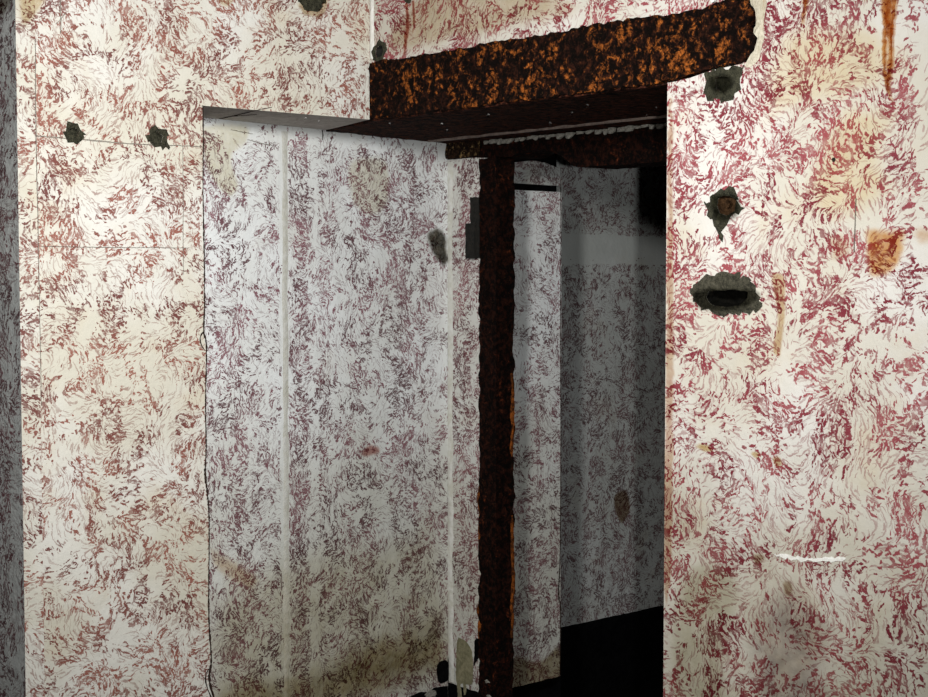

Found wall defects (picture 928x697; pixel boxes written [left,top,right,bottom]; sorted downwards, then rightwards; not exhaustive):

rust [882,0,896,98]
crack [35,39,272,697]
peeling [425,603,482,697]